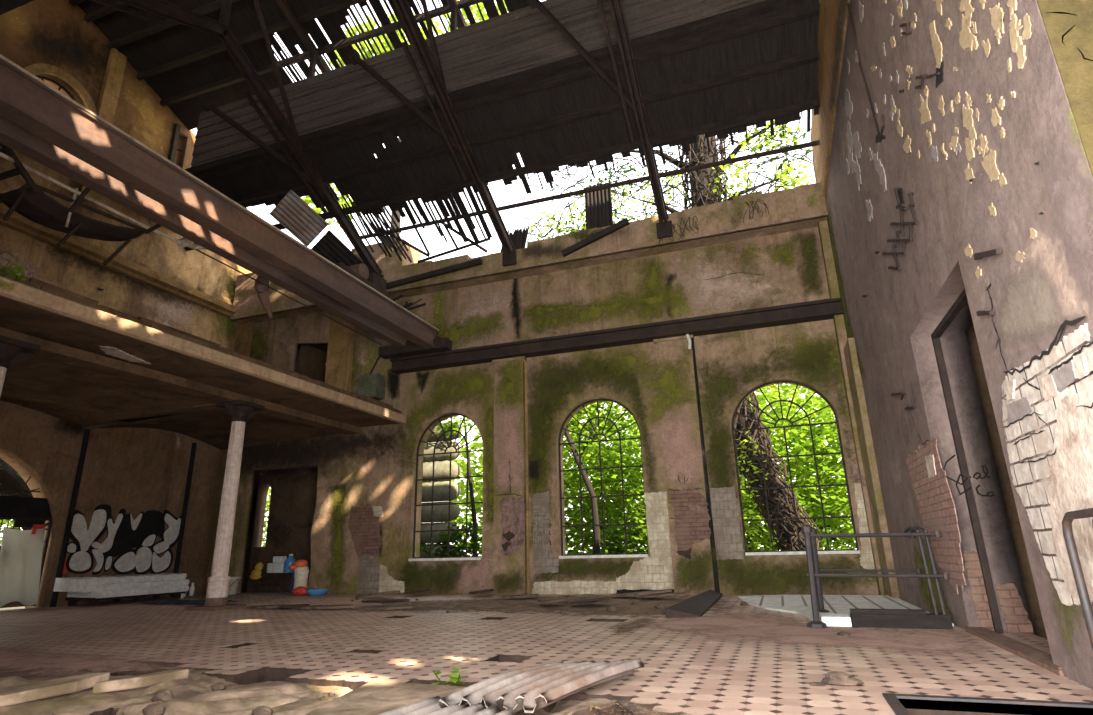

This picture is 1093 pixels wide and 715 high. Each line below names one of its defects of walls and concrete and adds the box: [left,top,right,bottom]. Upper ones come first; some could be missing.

peeling [882,0,917,56]
peeling [929,0,1032,73]
peeling [844,88,887,222]
peeling [866,65,1016,186]
water stain [461,278,575,343]
water stain [388,372,399,399]
water stain [484,408,494,523]
water stain [529,461,539,479]
water stain [628,374,654,493]
flaking render [348,504,382,559]
flaking render [906,437,1034,634]
water stain [400,561,477,593]